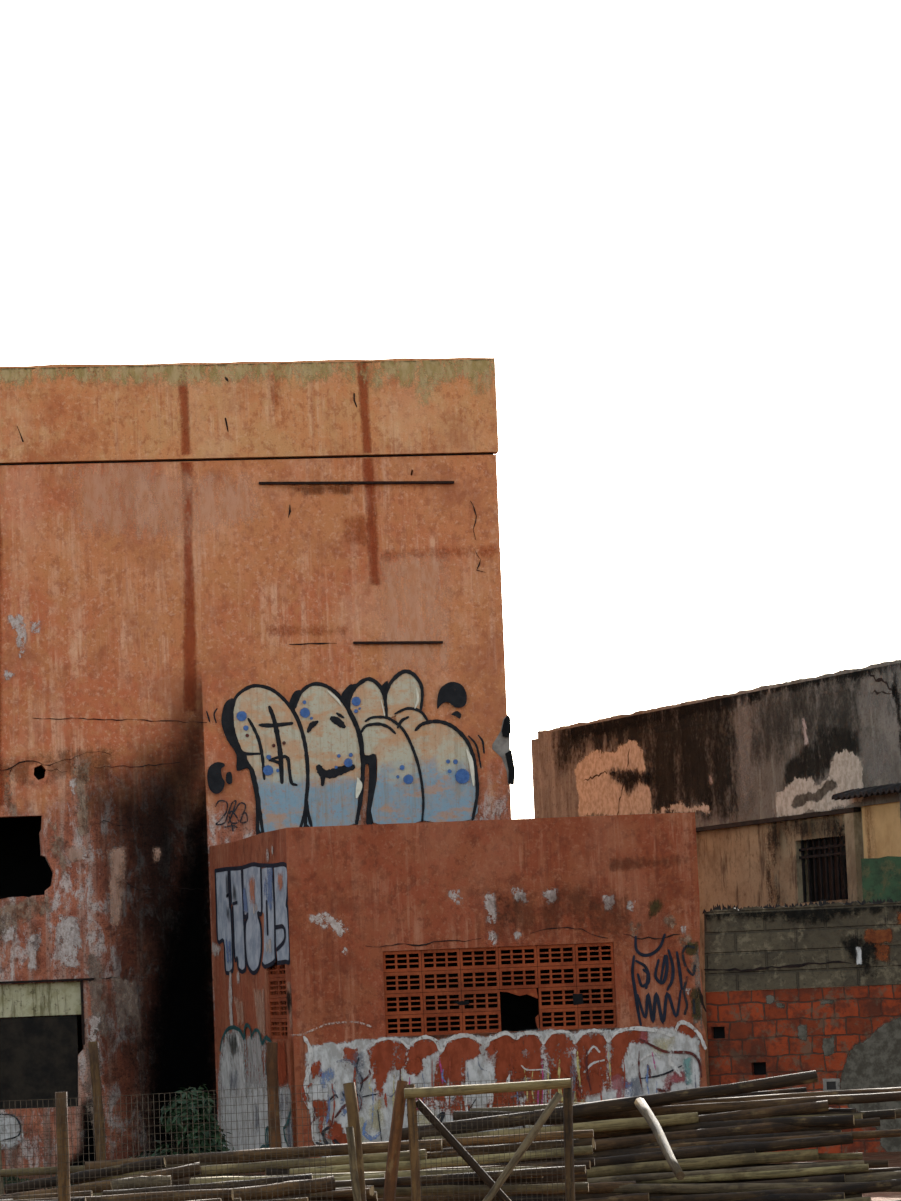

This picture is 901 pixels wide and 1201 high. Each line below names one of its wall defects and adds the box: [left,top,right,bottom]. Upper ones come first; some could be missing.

crack [1,751,180,775]
crack [35,716,207,724]
spalling [492,715,515,785]
peeling [574,739,711,817]
leakage [553,663,901,820]
peeling [775,749,864,820]
leakage [107,849,124,925]
peeling [309,912,348,953]
peeling [483,891,497,944]
peeling [543,889,558,904]
peeling [603,895,639,937]
peeling [0,896,140,1136]